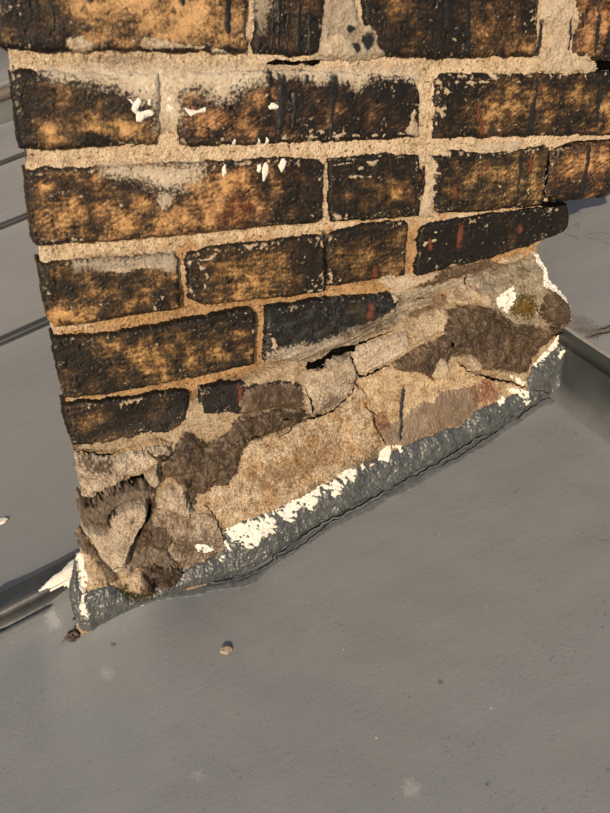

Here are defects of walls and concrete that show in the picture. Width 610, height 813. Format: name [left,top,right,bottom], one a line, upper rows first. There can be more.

crack [283,329,394,447]
peeling [496,286,516,313]
peeling [533,335,565,367]
spalling [128,464,184,572]
crack [202,362,551,585]